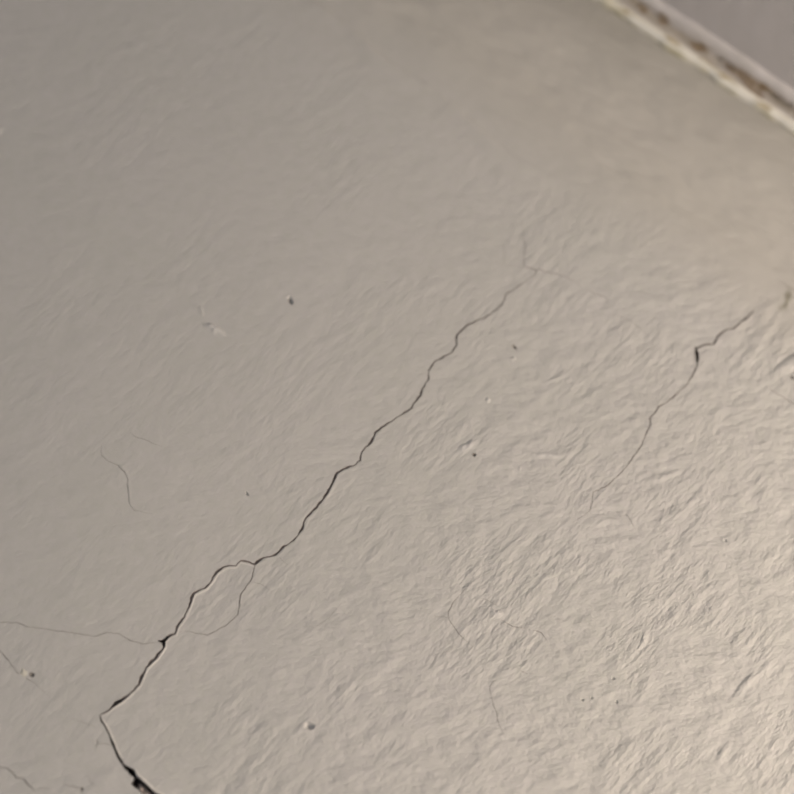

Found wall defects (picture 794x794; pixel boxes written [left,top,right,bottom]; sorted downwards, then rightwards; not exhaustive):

corrosion [739,71,767,98]
crack [0,226,572,794]
crack [575,309,756,521]